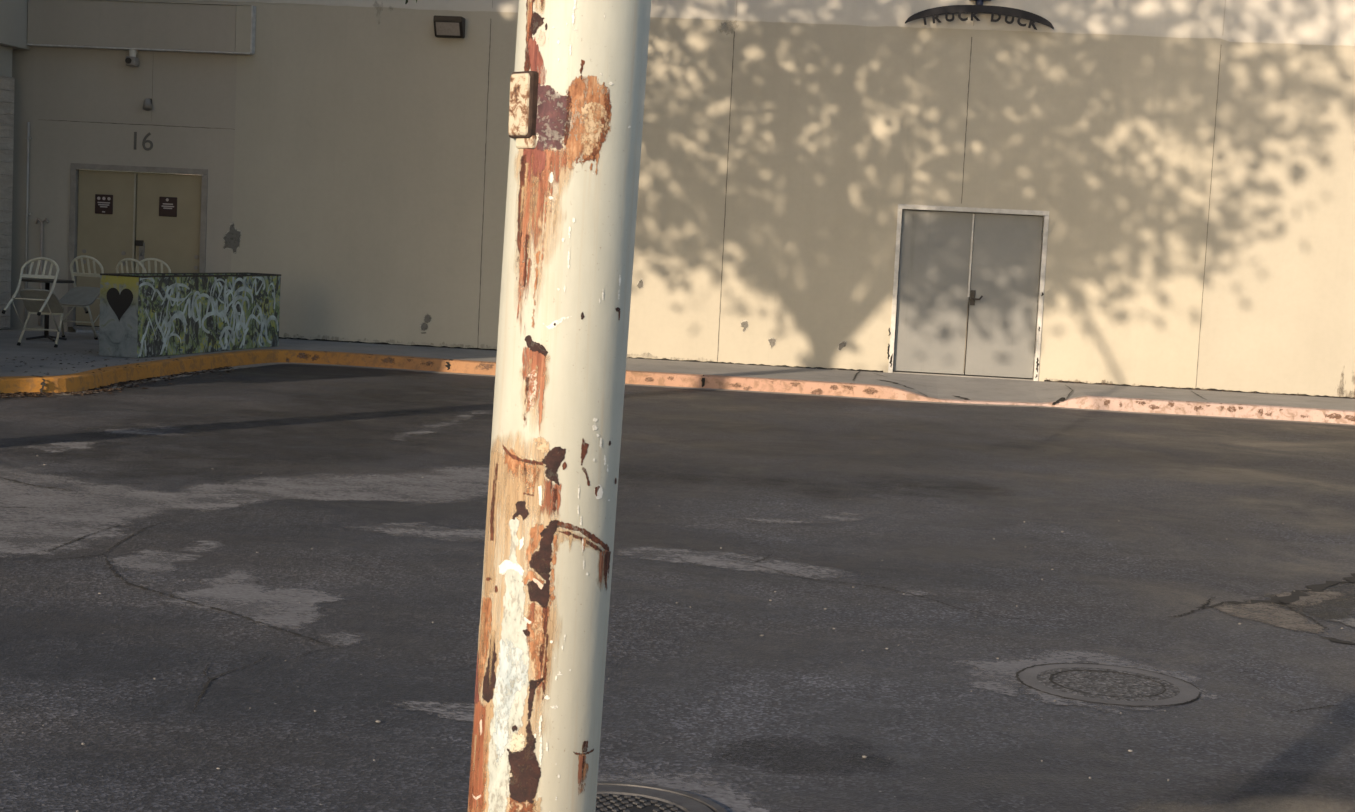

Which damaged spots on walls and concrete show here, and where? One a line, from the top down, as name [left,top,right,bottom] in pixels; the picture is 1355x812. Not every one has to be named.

rust [468,0,612,812]
peeling [577,418,610,575]
spalling [1104,399,1282,416]
crack [45,520,340,712]
peeling [474,437,571,812]
crack [1167,573,1355,644]